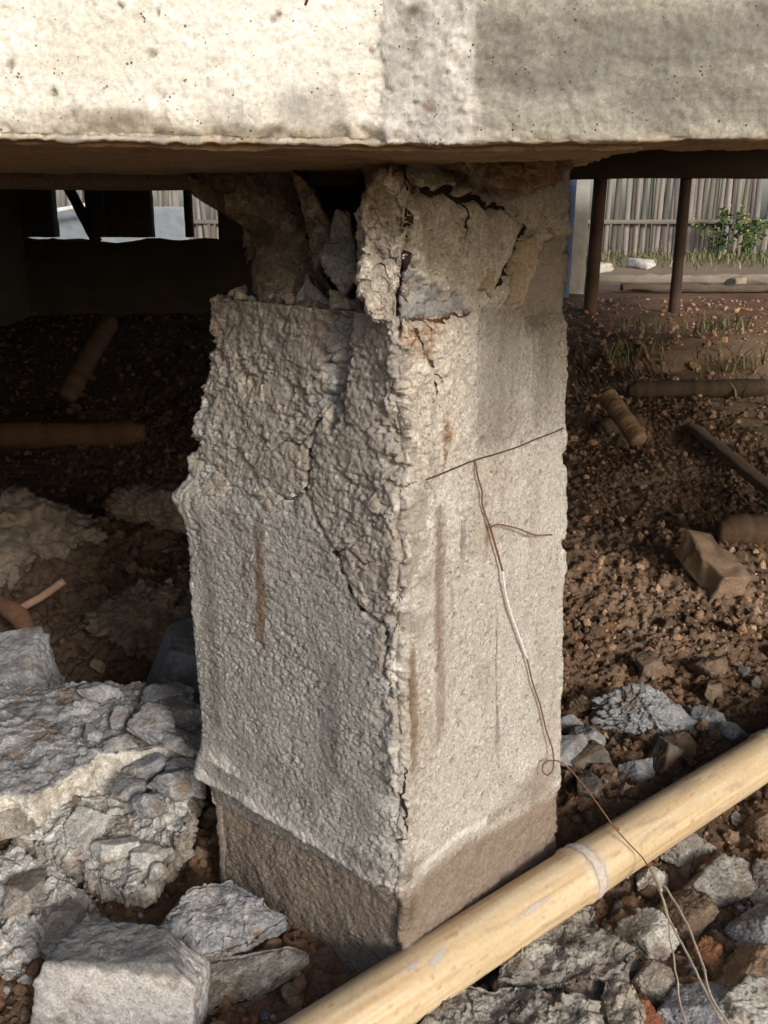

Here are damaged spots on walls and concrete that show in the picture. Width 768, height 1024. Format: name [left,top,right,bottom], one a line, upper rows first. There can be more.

crack [399,181,526,408]
flaking render [477,234,568,318]
spalling [187,271,471,675]
crack [272,418,393,698]
leakage [388,471,411,516]
leakage [193,746,488,893]
crack [398,756,408,840]